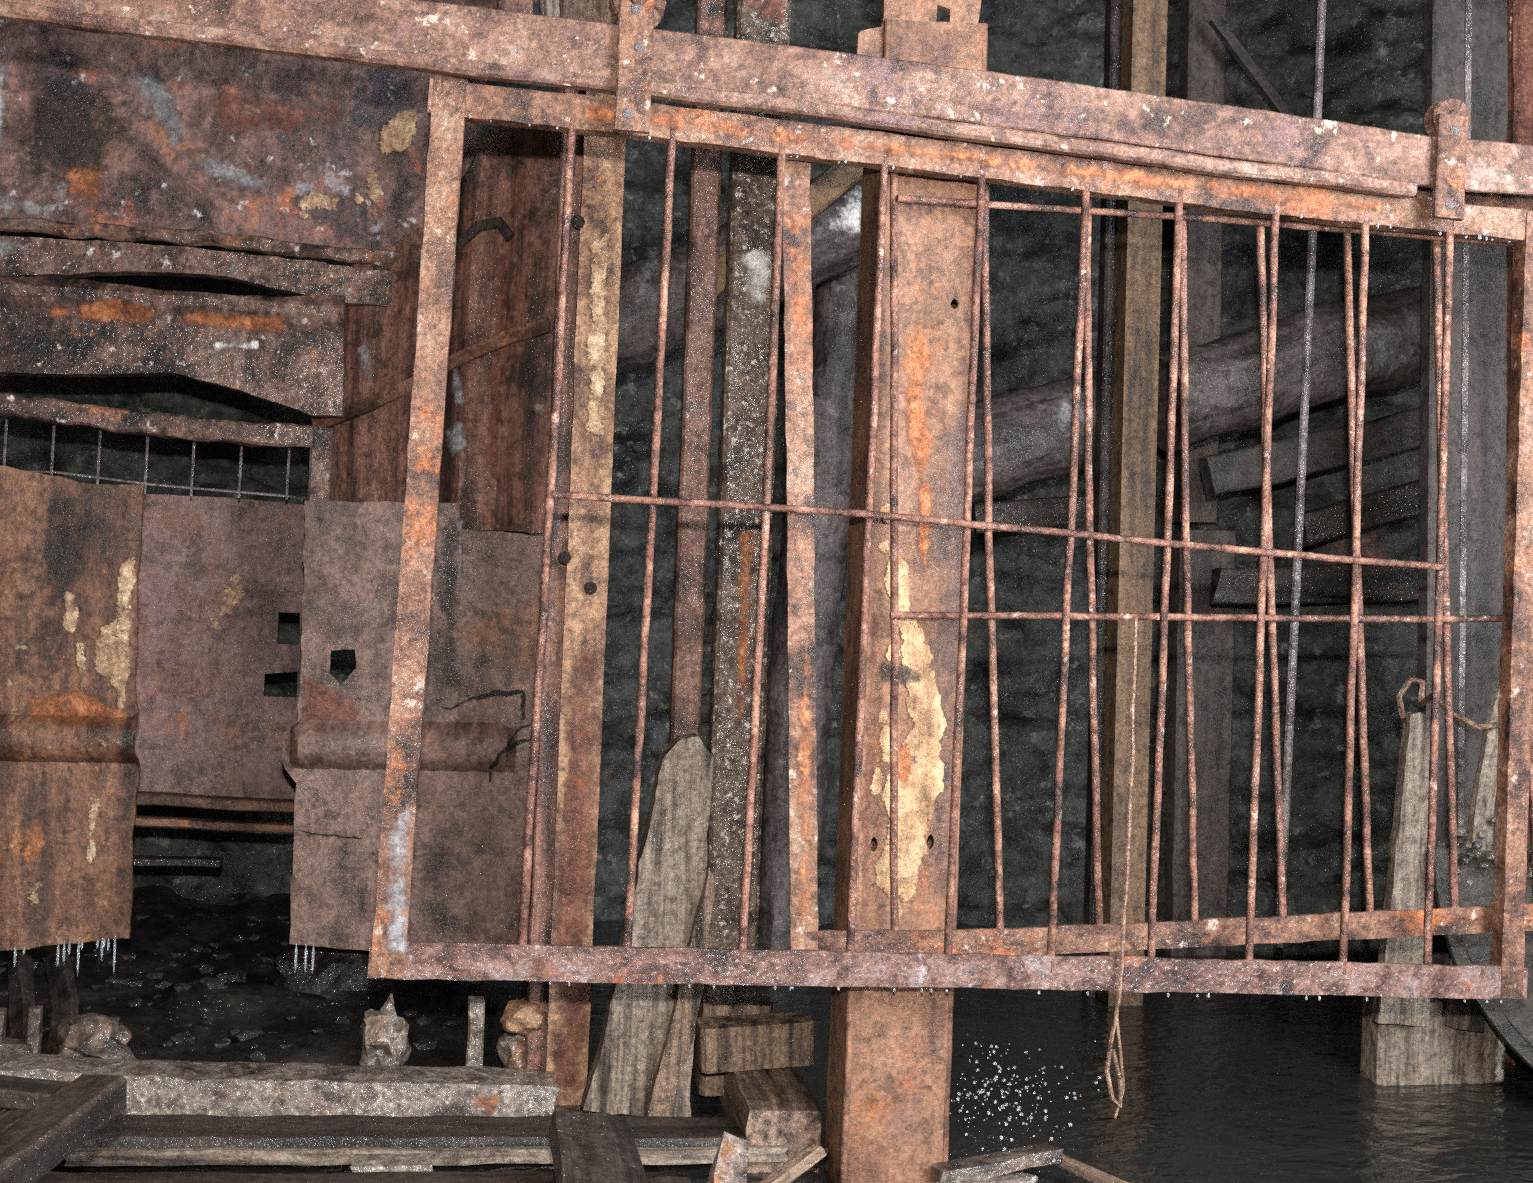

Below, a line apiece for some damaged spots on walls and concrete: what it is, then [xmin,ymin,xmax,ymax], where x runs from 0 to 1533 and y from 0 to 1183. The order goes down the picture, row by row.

corrosion [1509,0,1533,138]
corrosion [837,135,1322,201]
corrosion [903,324,932,587]
corrosion [736,532,754,717]
corrosion [25,882,43,904]
corrosion [31,689,125,725]
corrosion [86,793,100,864]
corrosion [558,652,597,946]
corrosion [799,691,812,877]
corrosion [862,615,878,930]
corrosion [898,743,912,782]
corrosion [539,959,588,1087]